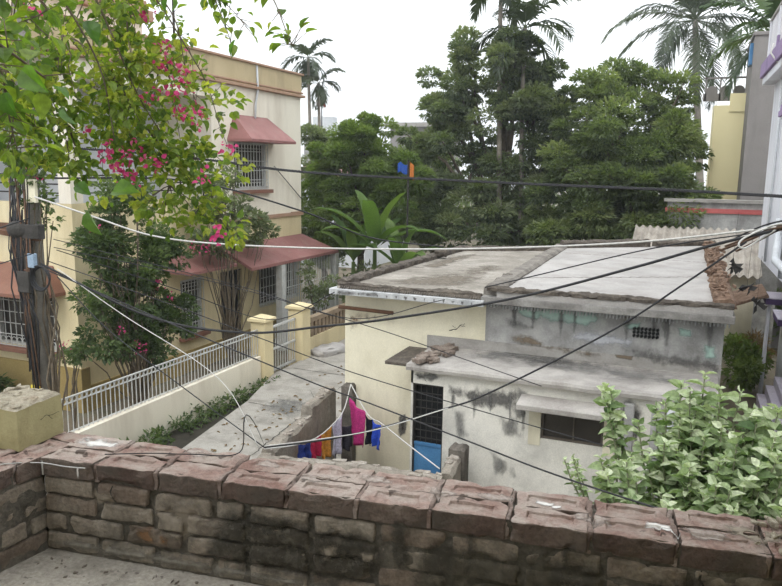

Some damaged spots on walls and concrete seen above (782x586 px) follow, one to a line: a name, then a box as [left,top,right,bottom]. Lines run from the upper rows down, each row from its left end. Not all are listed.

water stain [451,388,526,434]